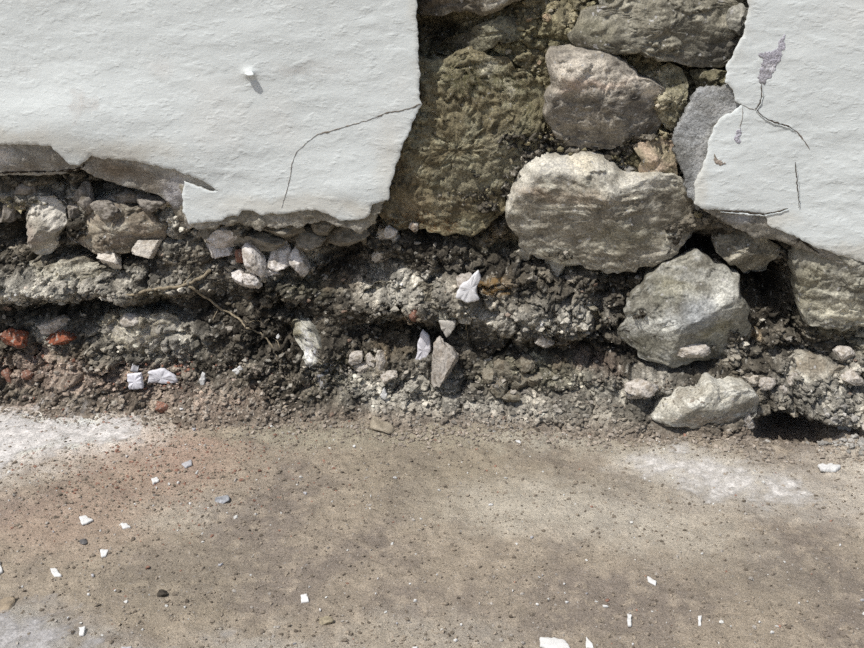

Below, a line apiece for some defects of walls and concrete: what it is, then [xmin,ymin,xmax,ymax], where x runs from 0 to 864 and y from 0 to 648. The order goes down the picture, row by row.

crack [283,104,420,201]
crack [722,84,810,216]
flaking render [0,0,864,444]